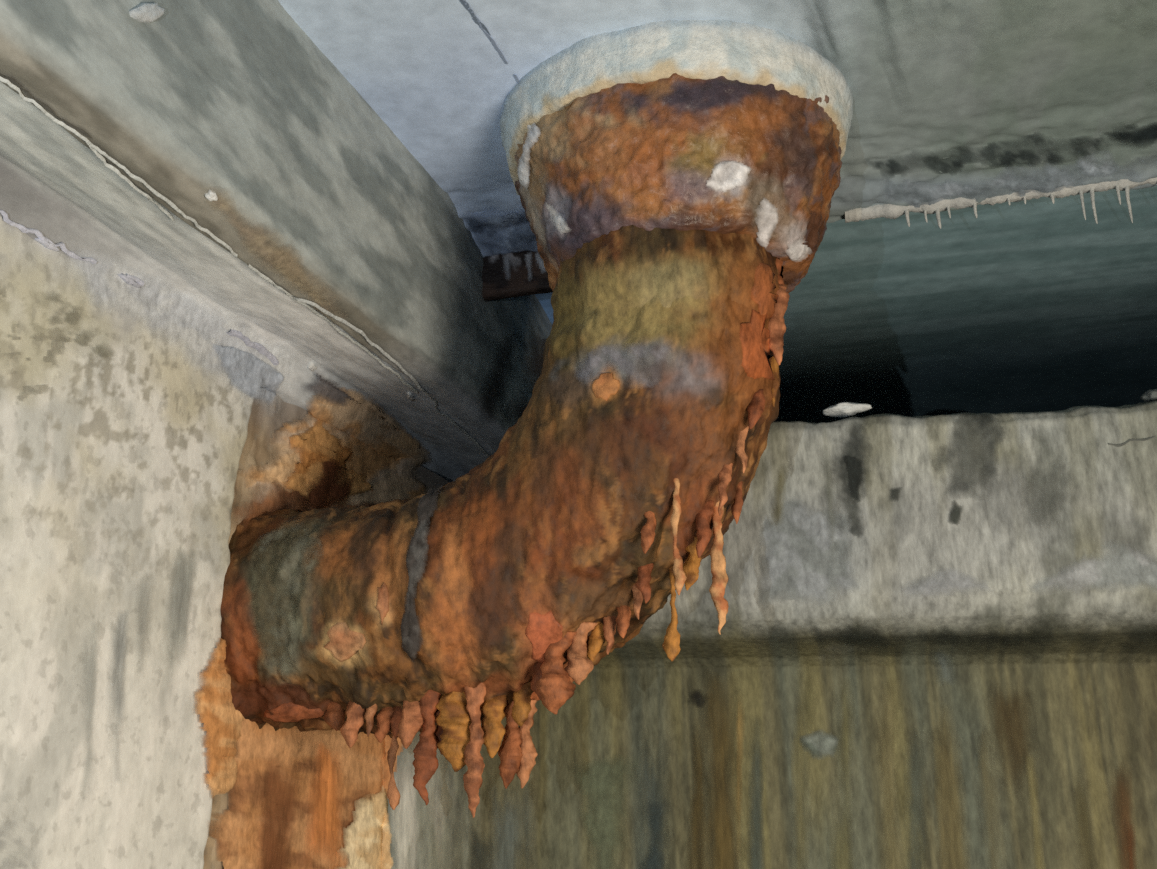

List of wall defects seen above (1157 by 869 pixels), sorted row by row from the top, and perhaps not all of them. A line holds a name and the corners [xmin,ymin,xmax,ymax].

crack [460,0,519,84]
rust [482,250,553,302]
mould [53,310,112,357]
rust [592,373,620,401]
rust [247,377,429,522]
rust [662,258,790,661]
water stain [174,561,192,642]
water stain [115,617,125,716]
rust [196,511,656,869]